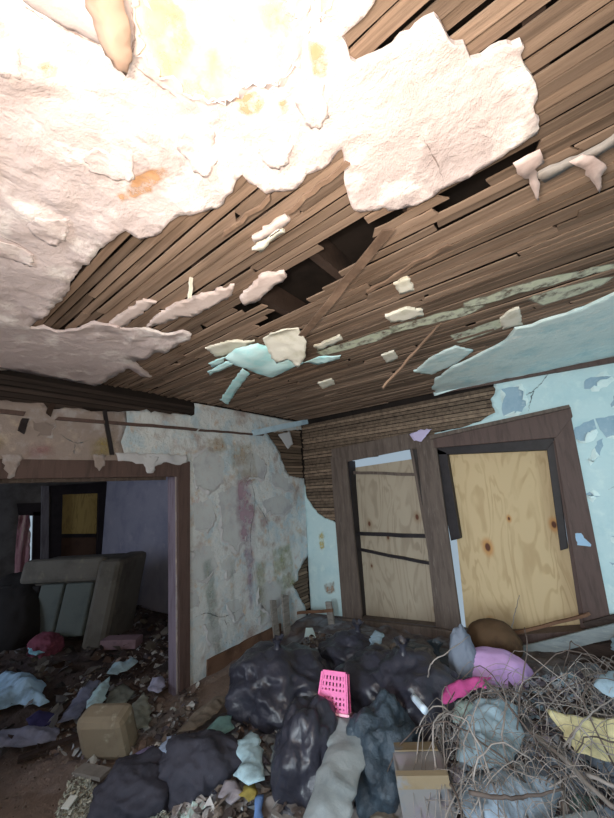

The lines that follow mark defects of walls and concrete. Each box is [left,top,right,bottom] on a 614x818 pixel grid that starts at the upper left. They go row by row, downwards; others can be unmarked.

flaking render [0,0,614,520]
peeling [256,556,310,629]